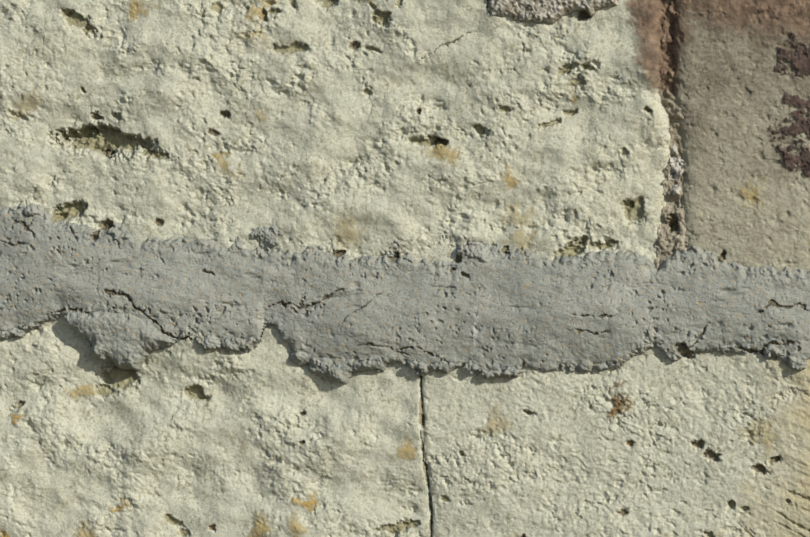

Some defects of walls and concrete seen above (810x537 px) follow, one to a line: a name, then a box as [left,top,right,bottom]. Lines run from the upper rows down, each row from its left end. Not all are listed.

peeling [774,33,810,76]
peeling [769,94,810,176]
crack [104,289,196,342]
crack [365,342,465,365]
crack [419,374,433,537]